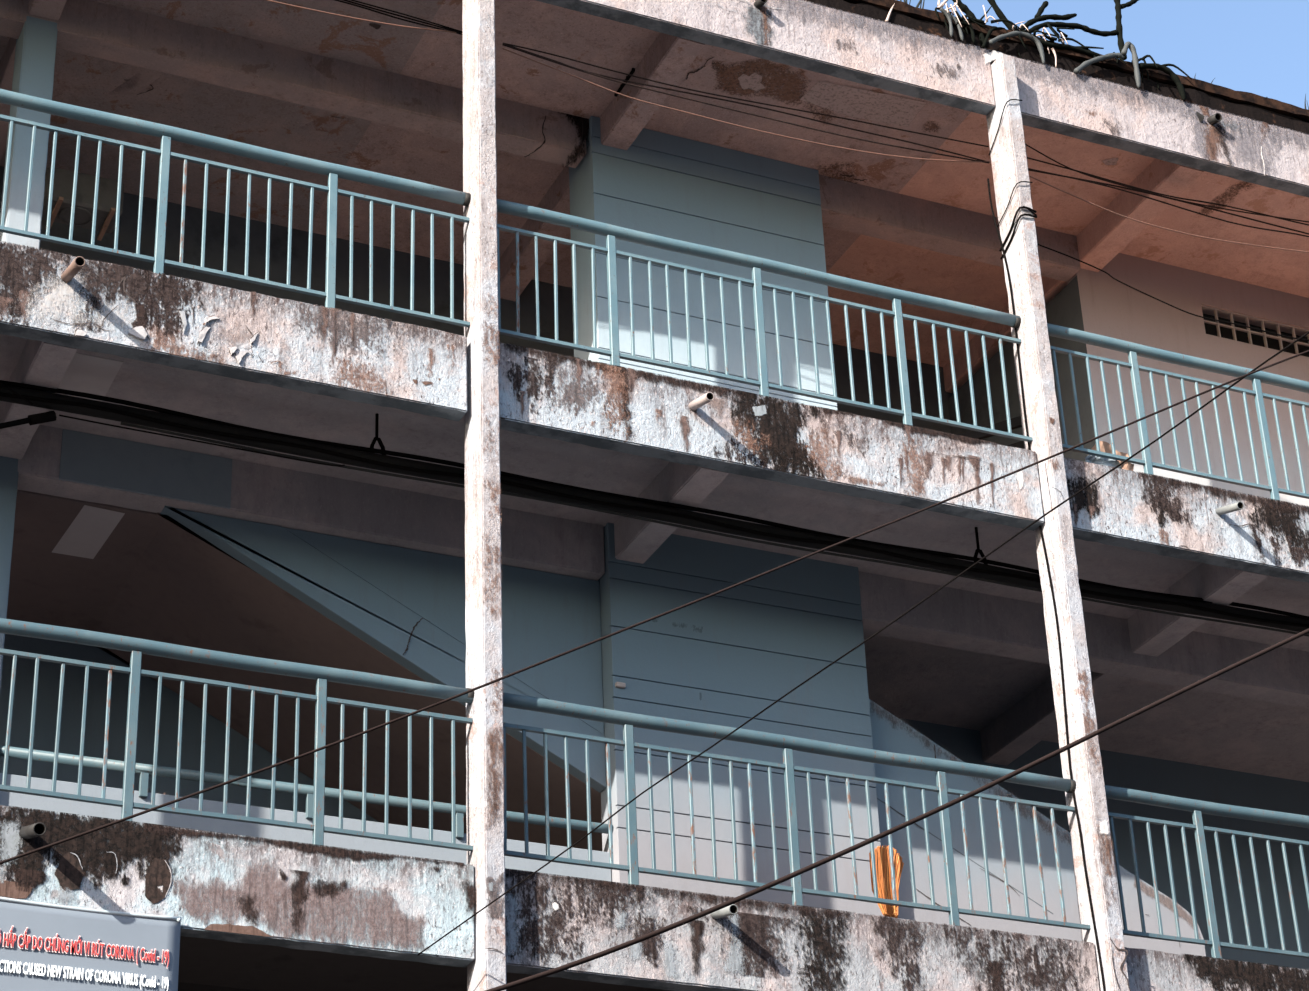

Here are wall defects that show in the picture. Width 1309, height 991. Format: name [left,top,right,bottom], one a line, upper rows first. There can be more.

peeling [27,277,150,341]
leakage [0,242,205,336]
flaking render [197,315,281,364]
leakage [288,300,439,362]
leakage [504,343,997,505]
rust [900,425,927,496]
leakage [1066,473,1100,525]
leakage [1138,472,1309,567]
leakage [0,806,477,950]
leakage [505,868,852,991]
leakage [865,914,1090,991]
mould [1183,954,1309,991]